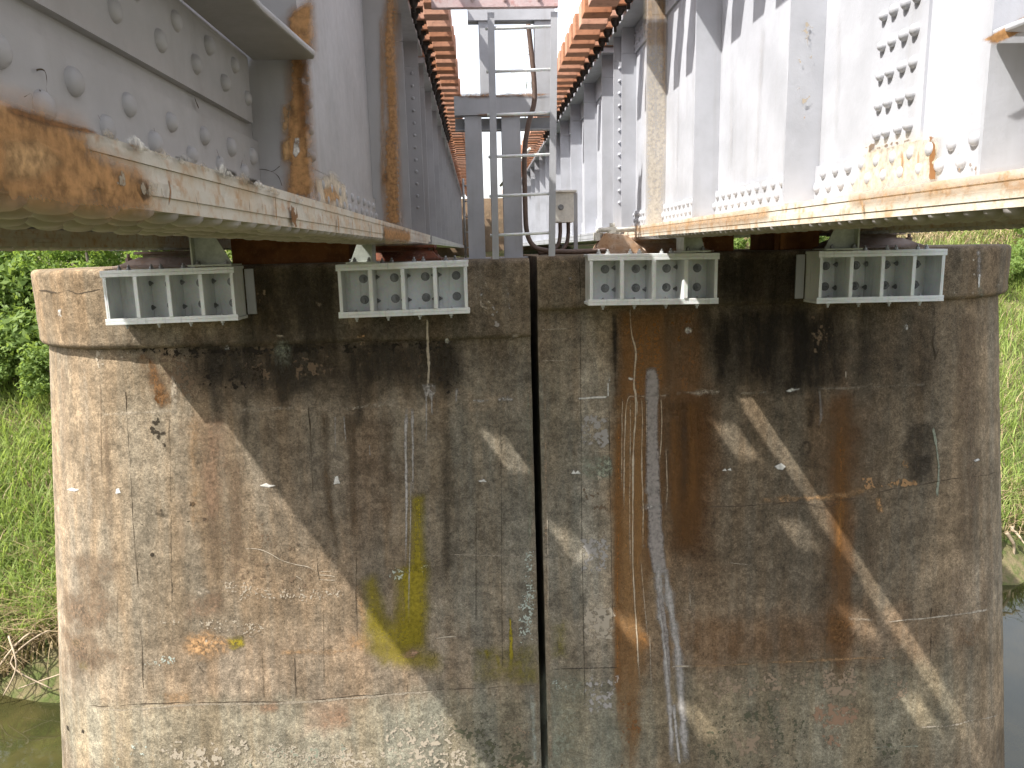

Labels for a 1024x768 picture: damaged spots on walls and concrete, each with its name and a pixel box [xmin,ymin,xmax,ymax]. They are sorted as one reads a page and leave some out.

rust [0,99,150,211]
rust [275,0,315,227]
rust [371,0,410,242]
rust [638,212,766,231]
rust [853,137,983,211]
rust [149,359,169,406]
water stain [138,270,459,588]
rust [615,313,666,767]
water stain [716,258,846,418]
rust [862,461,917,511]
water stain [909,424,940,496]